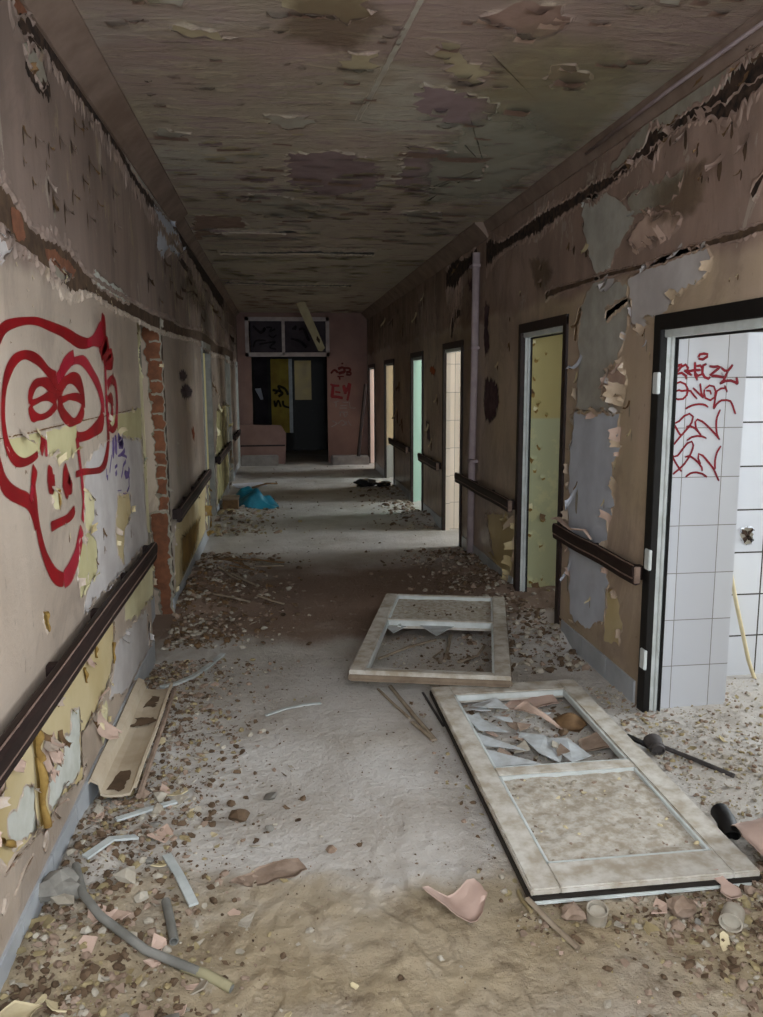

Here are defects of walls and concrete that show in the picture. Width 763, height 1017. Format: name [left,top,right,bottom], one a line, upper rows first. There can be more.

flaking render [12,0,49,92]
peeling [257,0,378,34]
peeling [336,28,405,86]
peeling [424,39,508,98]
peeling [461,0,578,44]
peeling [540,60,651,91]
flaking render [610,45,763,183]
peeling [152,112,529,254]
peeling [538,166,763,549]
peeling [0,118,235,880]
peeling [485,509,515,581]
peeling [559,546,624,649]